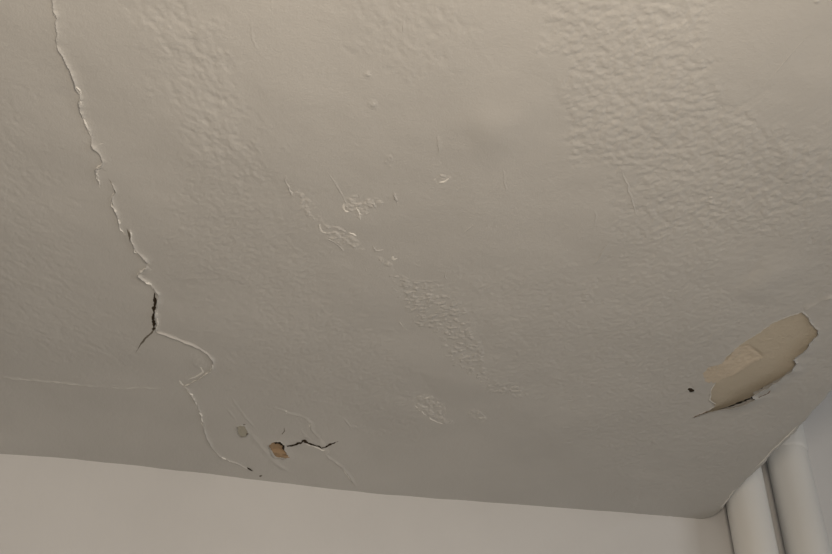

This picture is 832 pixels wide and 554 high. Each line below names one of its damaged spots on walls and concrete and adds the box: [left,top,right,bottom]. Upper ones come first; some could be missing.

crack [52,0,262,477]
peeling [673,293,832,428]
spalling [263,429,336,462]